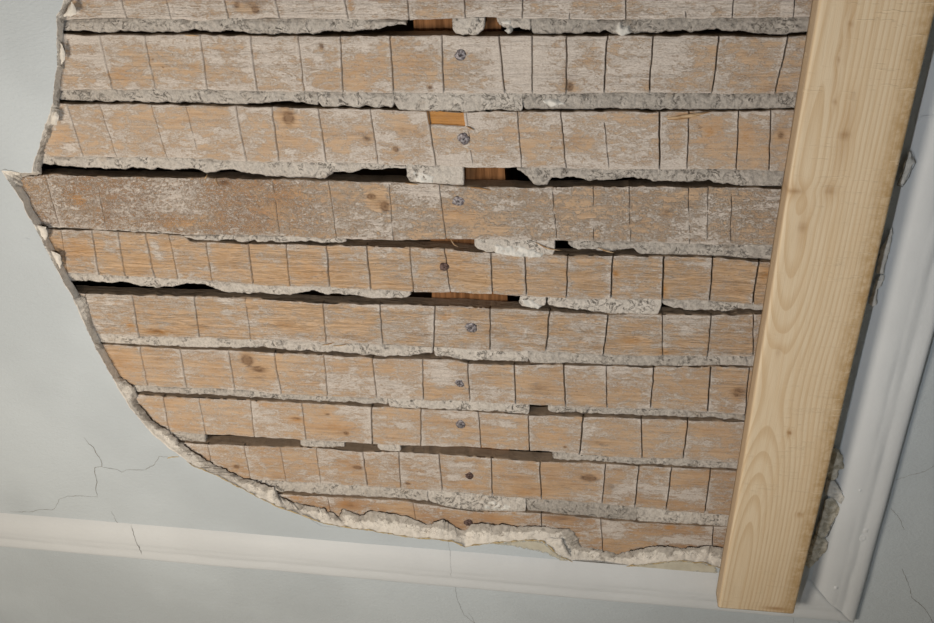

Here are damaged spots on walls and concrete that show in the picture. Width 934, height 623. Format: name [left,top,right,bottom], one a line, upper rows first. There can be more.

spalling [2,0,723,573]
spalling [869,228,893,307]
crack [121,377,569,619]
crack [621,545,722,553]
spalling [805,448,845,568]